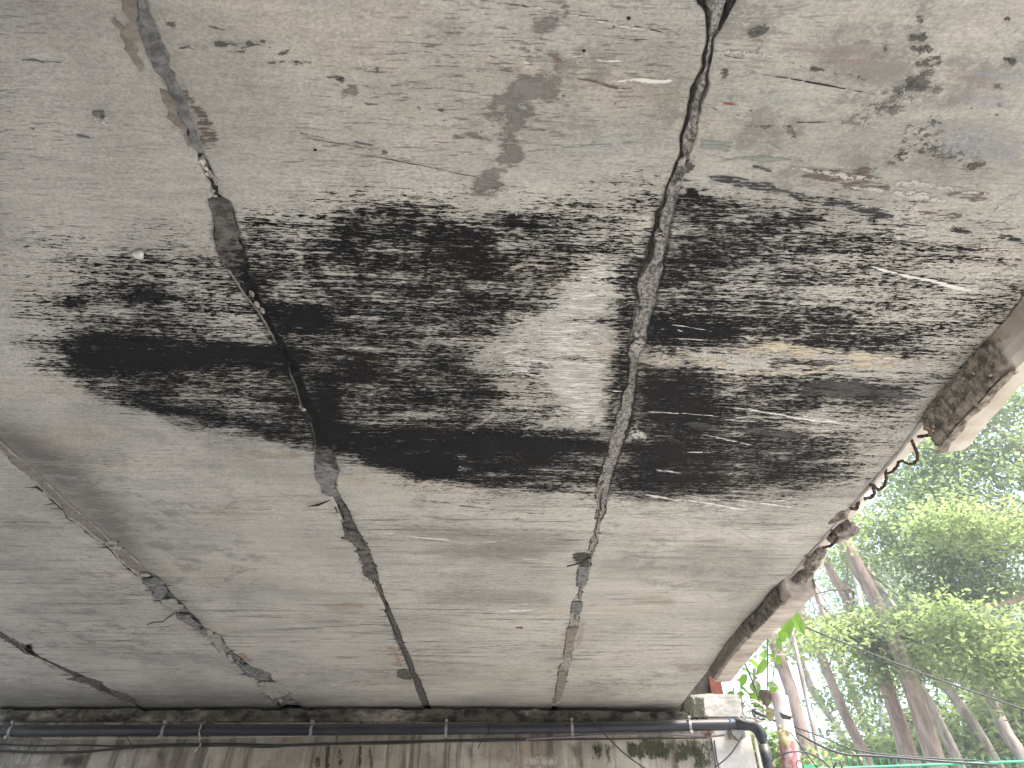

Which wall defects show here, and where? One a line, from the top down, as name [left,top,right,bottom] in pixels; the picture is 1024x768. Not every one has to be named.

water stain [179,26,311,65]
water stain [533,5,569,33]
water stain [0,67,1024,524]
spalling [850,339,1018,511]
crack [2,486,288,703]
crack [257,500,514,702]
crack [542,445,609,703]
spalling [709,588,783,679]